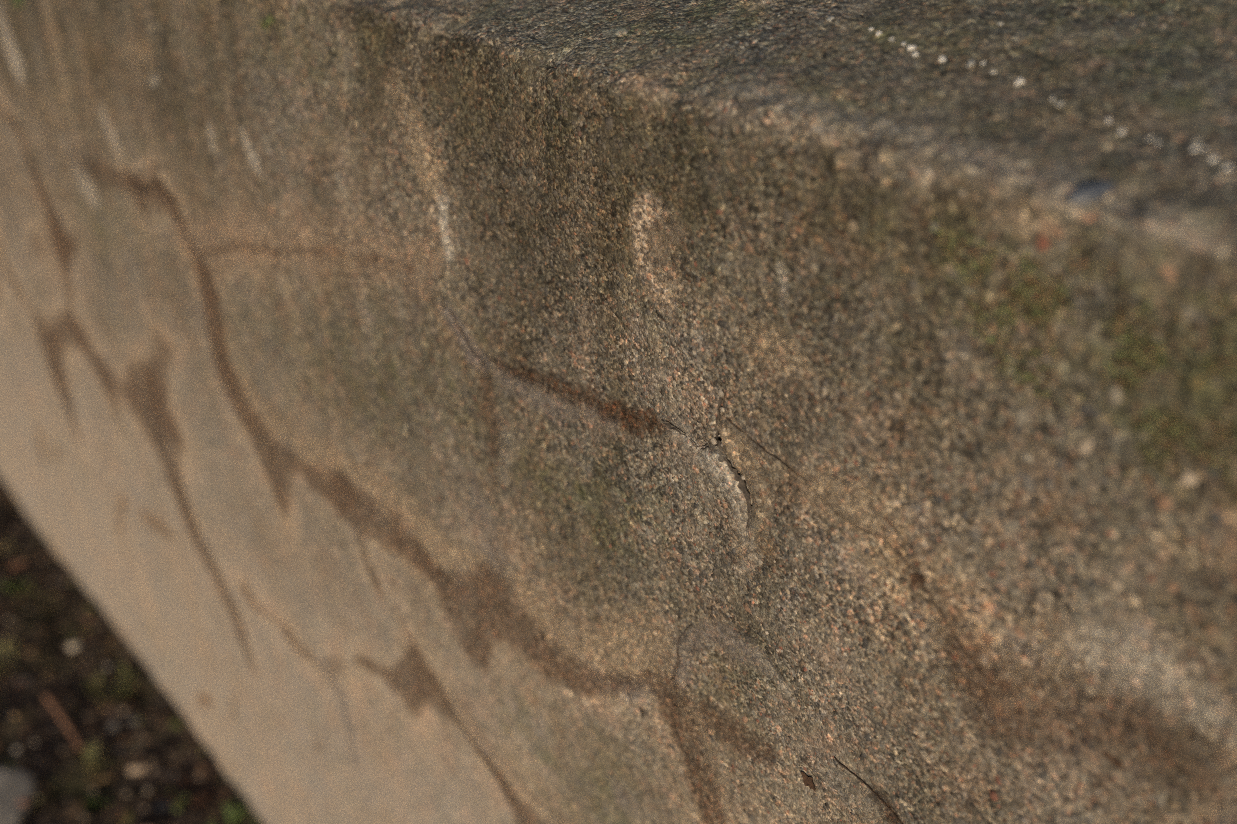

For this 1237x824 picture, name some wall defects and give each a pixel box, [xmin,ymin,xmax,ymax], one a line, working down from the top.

water stain [2,111,251,663]
water stain [353,116,453,299]
water stain [159,185,769,824]
crack [661,388,994,687]